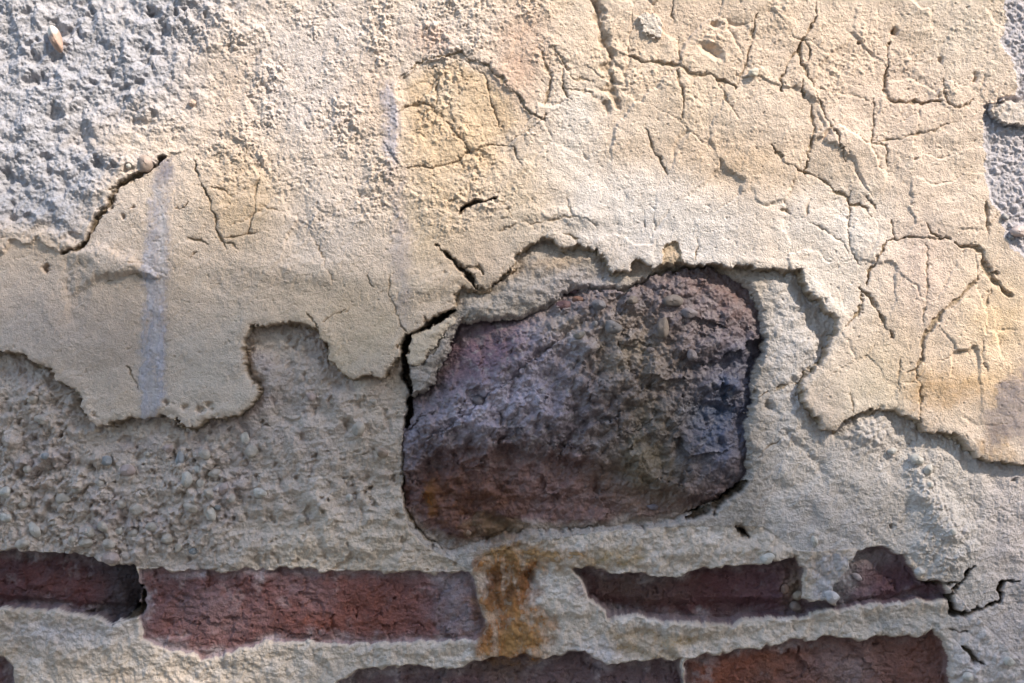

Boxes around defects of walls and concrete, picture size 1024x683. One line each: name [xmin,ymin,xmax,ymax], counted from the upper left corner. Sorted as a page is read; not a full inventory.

crack [399,50,582,128]
crack [631,25,755,120]
crack [771,10,876,213]
crack [871,31,969,163]
crack [62,156,167,263]
crack [368,278,455,428]
crack [435,244,507,291]
crack [459,197,497,215]
crack [853,225,1012,405]
spalling [0,238,1024,667]
corrosion [474,542,584,660]
crack [919,565,1019,665]